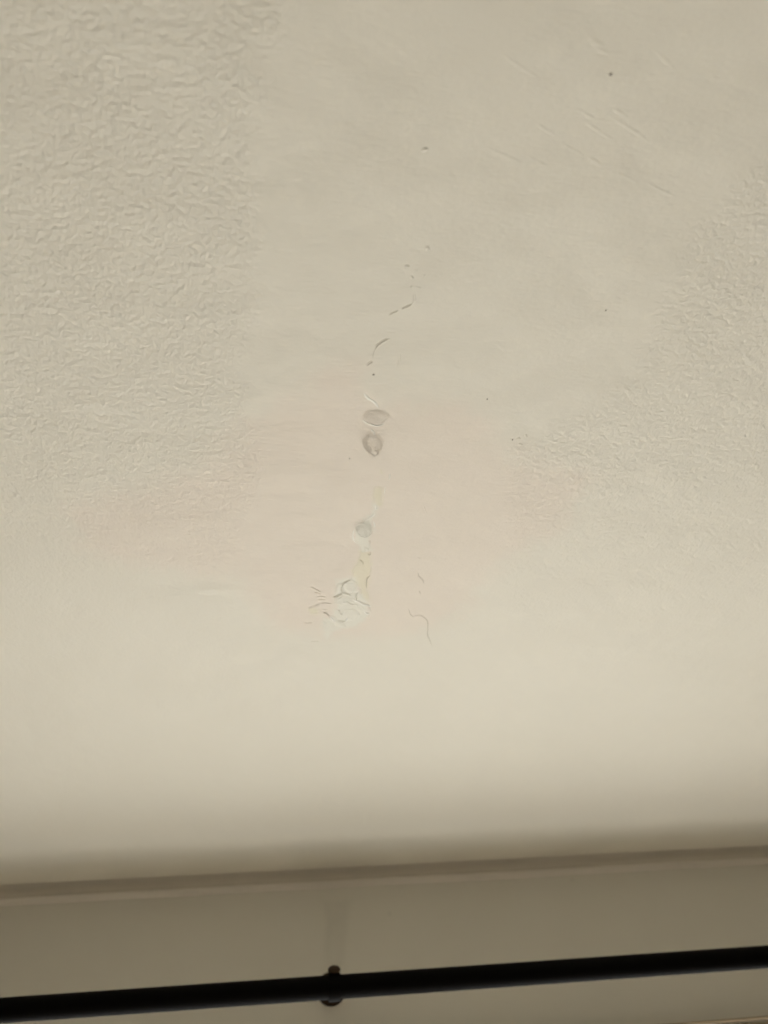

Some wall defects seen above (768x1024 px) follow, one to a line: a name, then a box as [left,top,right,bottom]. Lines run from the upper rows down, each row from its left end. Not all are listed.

crack [365,293,416,386]